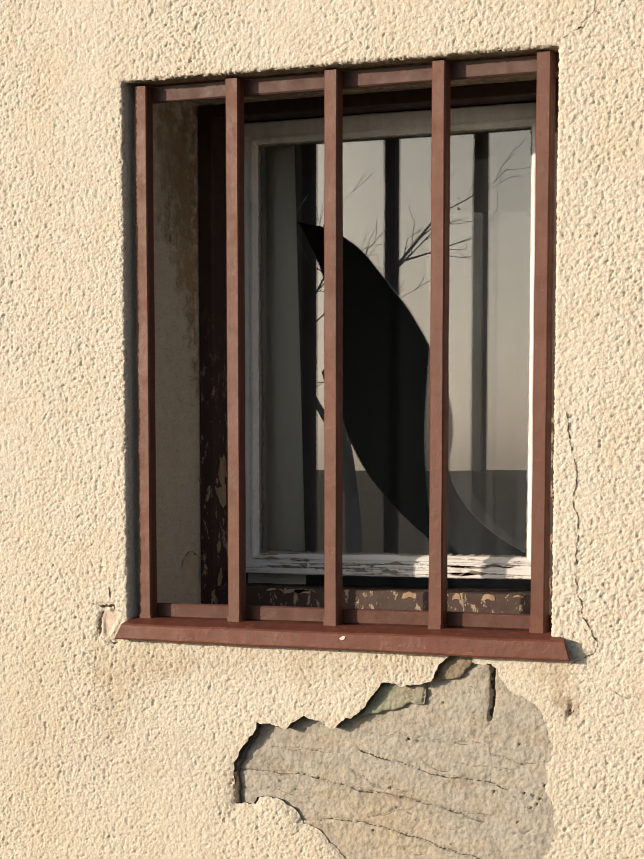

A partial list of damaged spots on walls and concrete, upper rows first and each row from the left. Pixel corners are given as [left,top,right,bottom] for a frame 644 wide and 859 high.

spalling [102,608,122,638]
crack [566,412,597,666]
spalling [231,656,556,859]